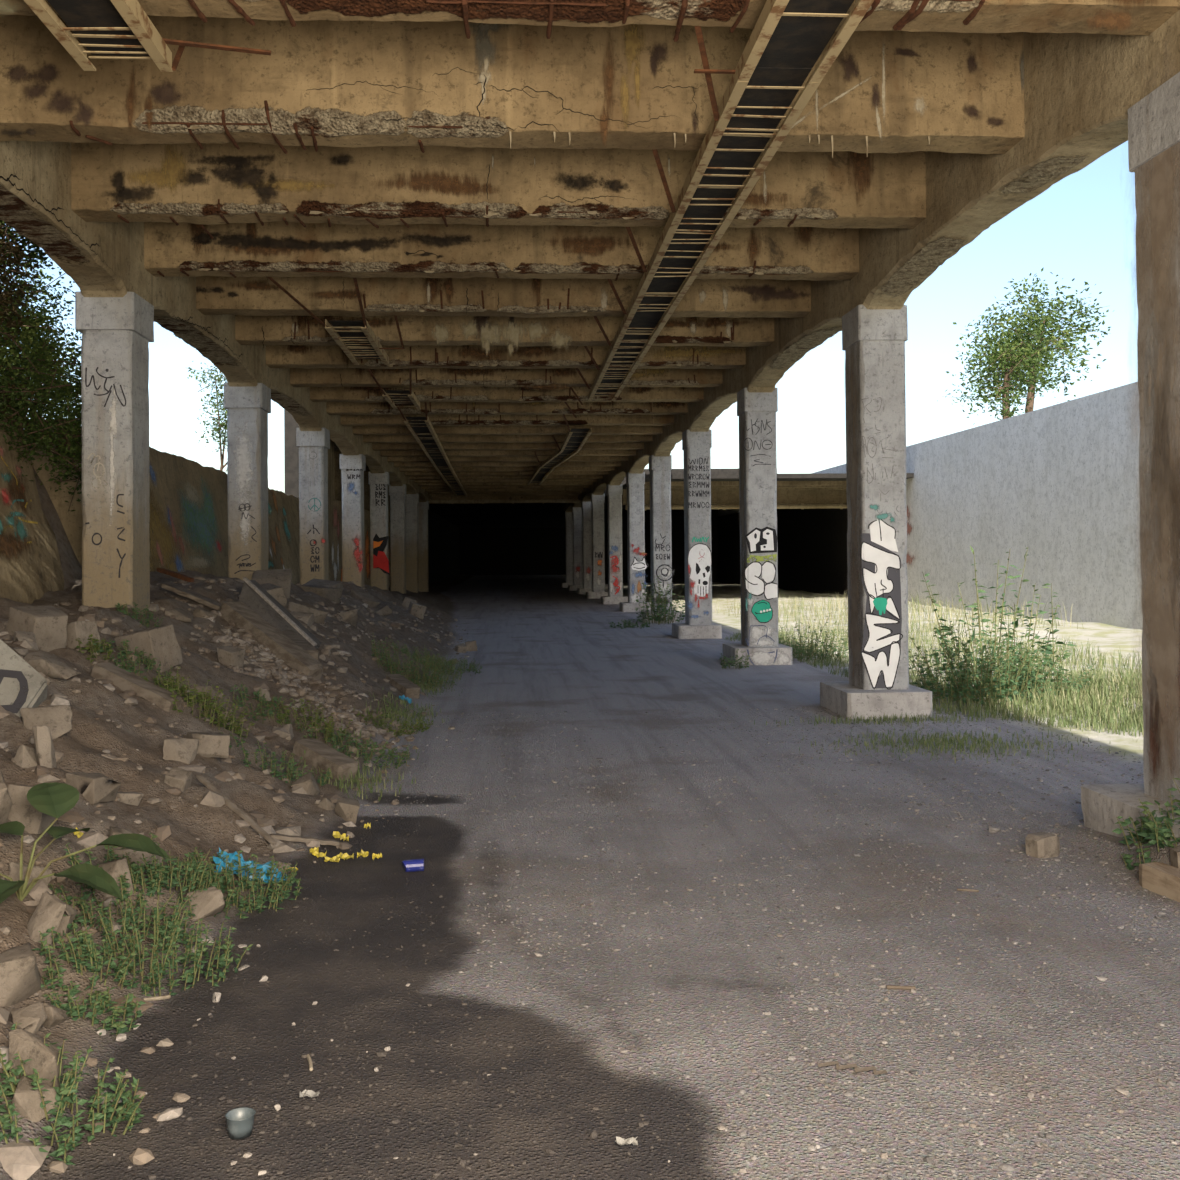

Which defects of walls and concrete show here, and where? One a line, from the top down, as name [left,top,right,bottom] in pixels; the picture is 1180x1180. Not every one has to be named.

spalling [228,0,259,26]
spalling [279,0,750,42]